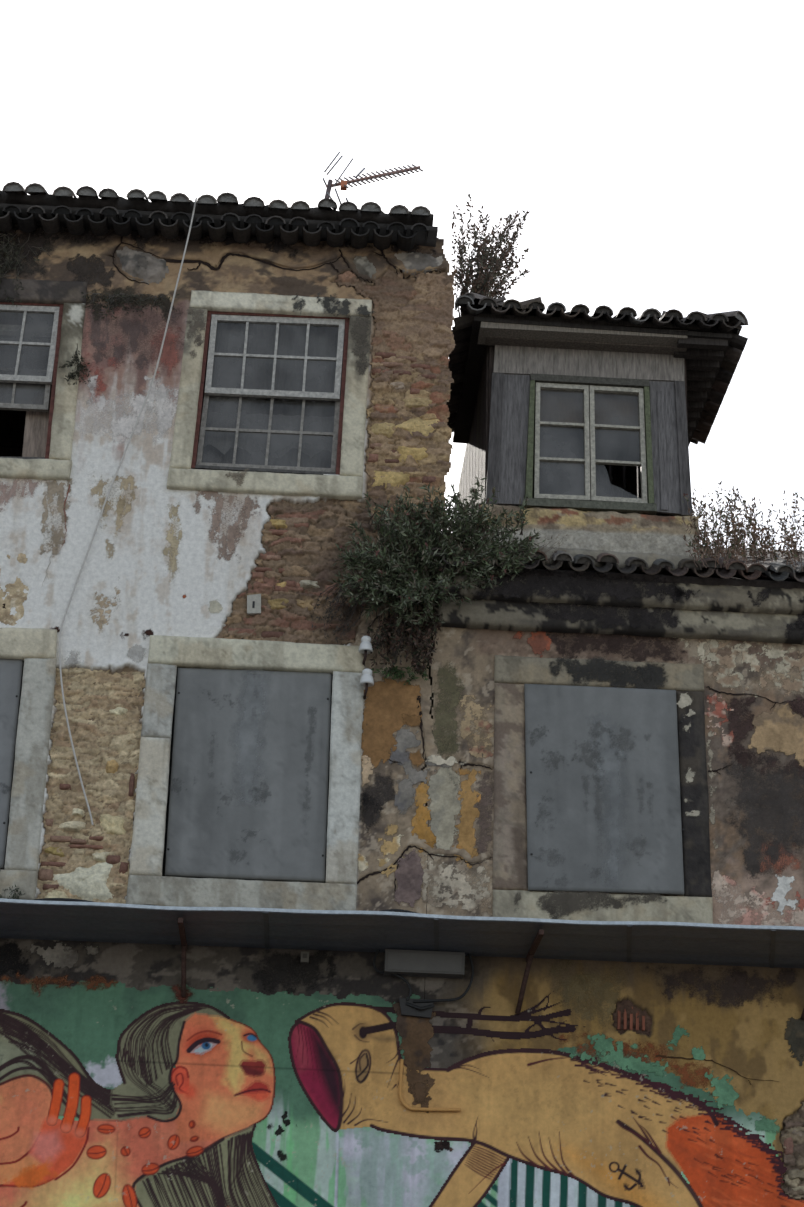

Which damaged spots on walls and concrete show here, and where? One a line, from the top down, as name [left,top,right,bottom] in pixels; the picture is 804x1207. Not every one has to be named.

crack [99,231,445,285]
flaking render [216,268,457,645]
flaking render [0,553,29,626]
peeling [673,637,804,824]
flaking render [36,667,146,904]
flaking render [358,677,494,917]
peeling [711,870,804,927]
peeling [569,1025,739,1110]
flaking render [748,1102,804,1199]